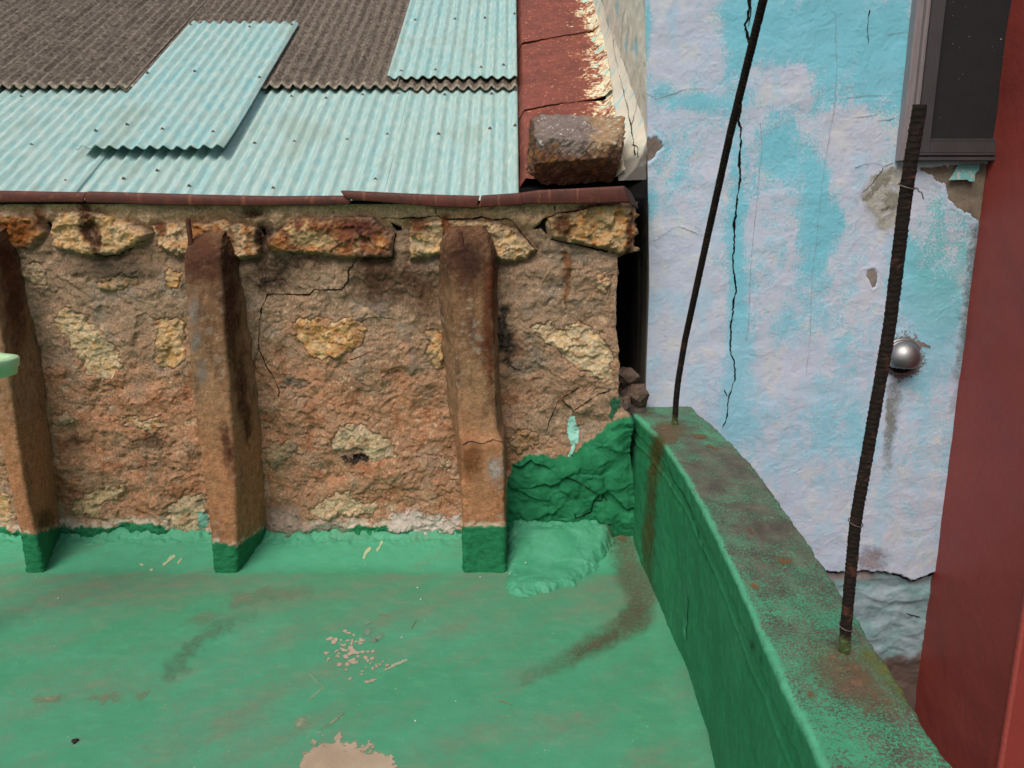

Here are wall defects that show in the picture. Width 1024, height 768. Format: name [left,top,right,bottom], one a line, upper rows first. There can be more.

crack [744,0,752,42]
peeling [647,137,663,161]
crack [723,104,762,426]
crack [254,205,614,397]
crack [545,387,610,434]
leakage [885,383,899,450]
spalling [838,104,987,656]
crack [566,478,607,519]
corrosion [568,422,682,660]
peeling [299,731,398,768]